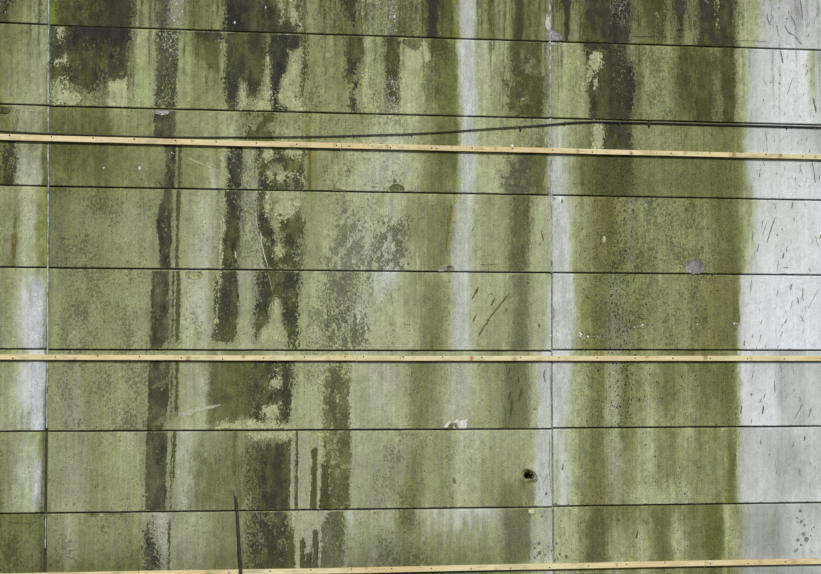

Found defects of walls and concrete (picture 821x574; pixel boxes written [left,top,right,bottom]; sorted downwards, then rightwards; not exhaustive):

water stain [631,0,739,122]
water stain [134,0,182,349]
water stain [141,360,180,571]
water stain [286,361,369,569]
spalling [521,469,538,483]